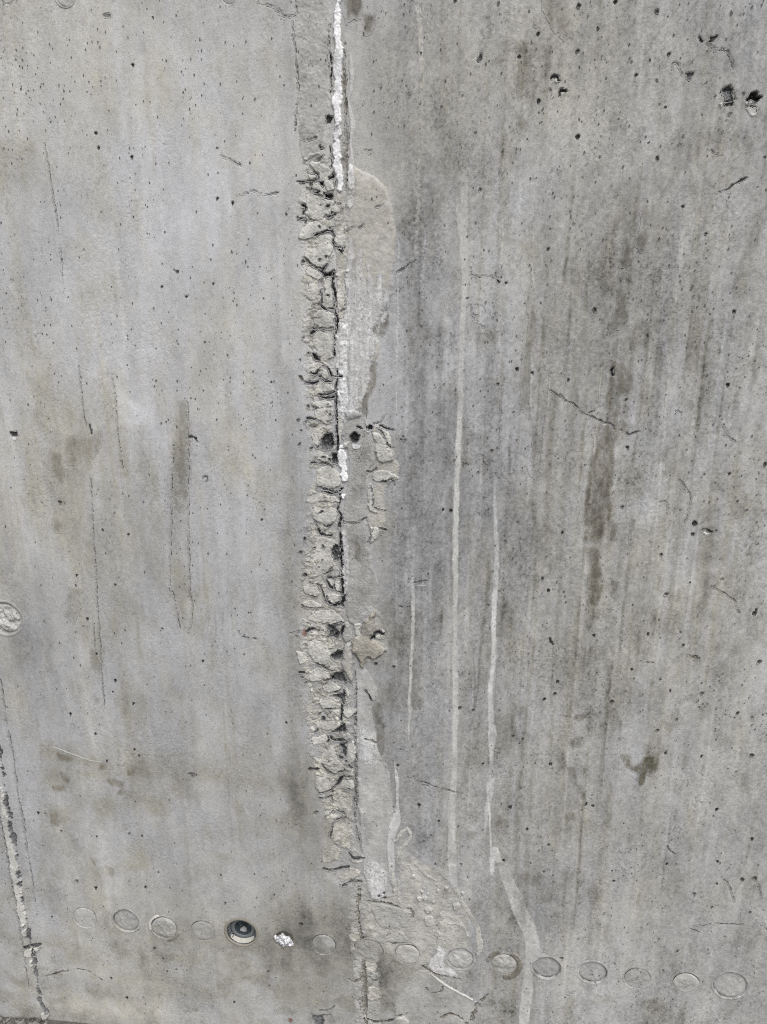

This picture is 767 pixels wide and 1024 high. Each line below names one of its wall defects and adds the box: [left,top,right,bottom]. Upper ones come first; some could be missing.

crack [325,53,333,168]
water stain [618,203,650,268]
crack [331,271,339,452]
crack [550,389,641,436]
water stain [608,287,629,333]
crack [336,487,344,595]
spalling [295,137,409,1024]
water stain [363,161,551,1024]
water stain [581,359,636,630]
crack [353,671,372,842]
water stain [620,753,661,787]